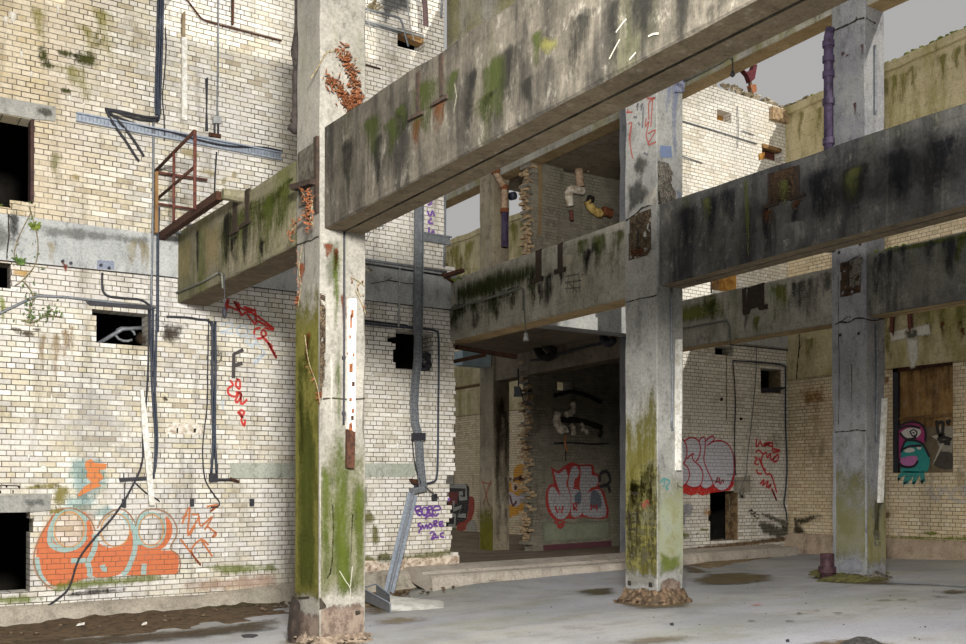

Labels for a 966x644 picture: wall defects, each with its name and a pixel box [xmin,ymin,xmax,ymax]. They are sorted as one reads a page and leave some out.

leakage [383,0,407,19]
leakage [571,9,589,61]
leakage [609,1,619,55]
leakage [633,0,652,28]
leakage [677,0,688,30]
leakage [523,76,531,98]
leakage [364,46,516,182]
spalling [629,161,676,260]
leakage [680,190,734,237]
spalling [840,257,862,297]
leakage [353,487,366,562]
leakage [692,514,820,549]